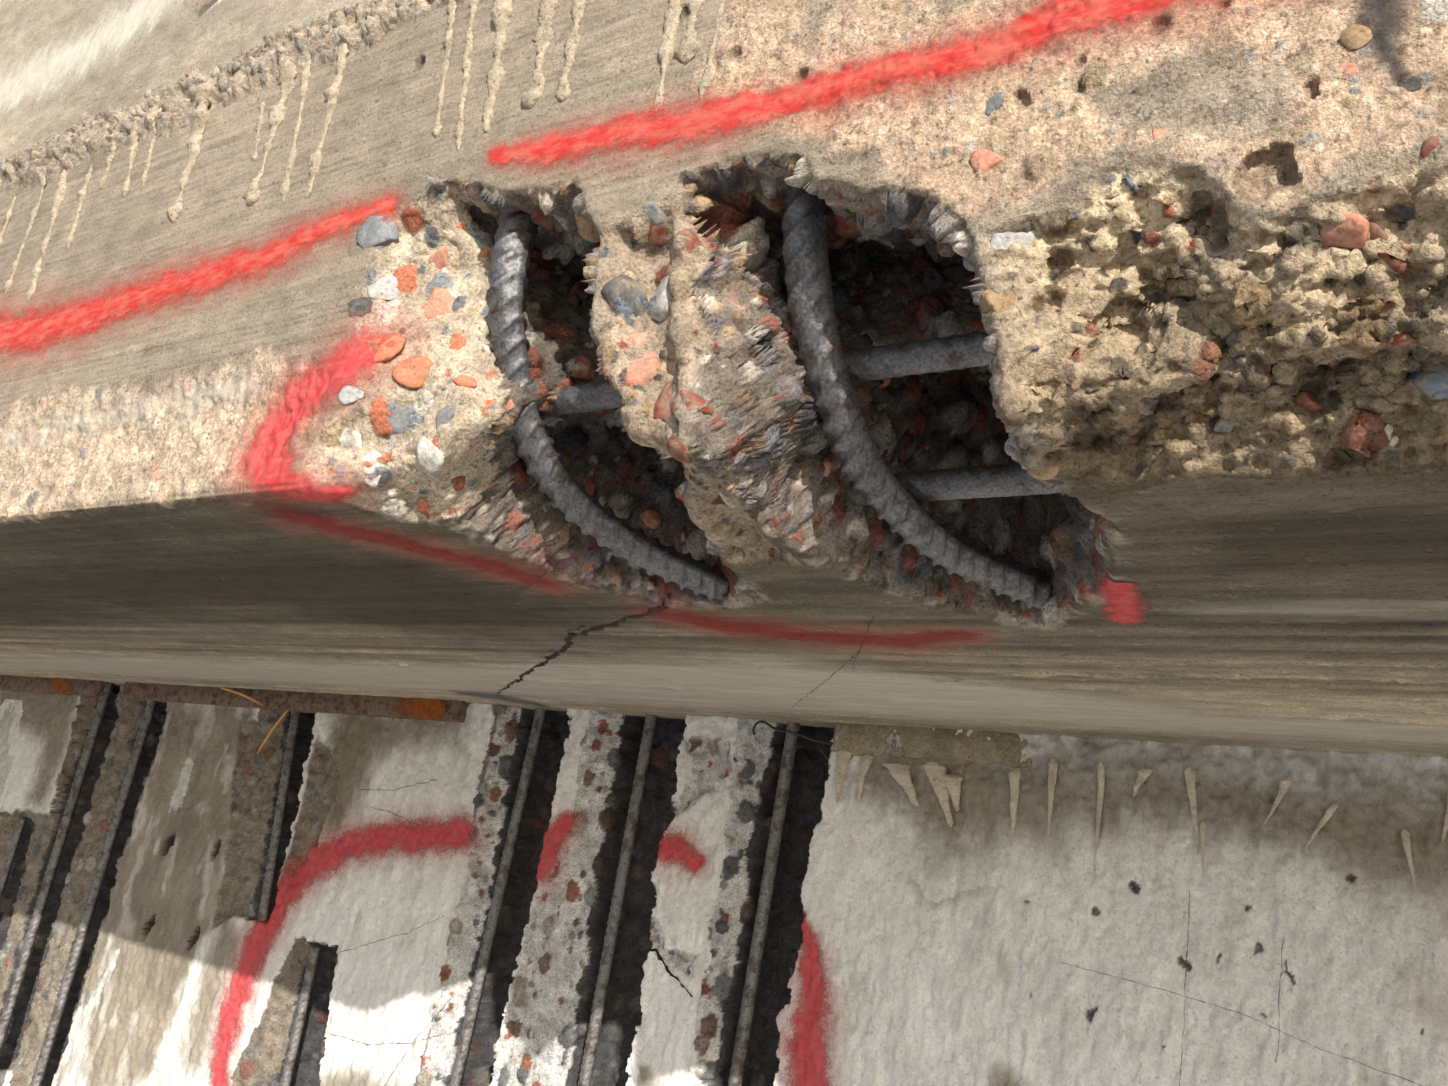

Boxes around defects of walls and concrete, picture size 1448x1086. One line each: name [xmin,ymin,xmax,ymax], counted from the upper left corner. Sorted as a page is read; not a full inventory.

leakage [0,0,183,111]
spalling [284,0,1448,626]
spalling [0,342,331,528]
crack [495,602,670,697]
spalling [0,682,169,1086]
spalling [279,946,321,1086]
spalling [448,708,547,1086]
spalling [487,872,559,1086]
spalling [578,714,657,1086]
spalling [670,735,734,820]
spalling [728,722,800,1086]
leakage [867,746,1448,883]